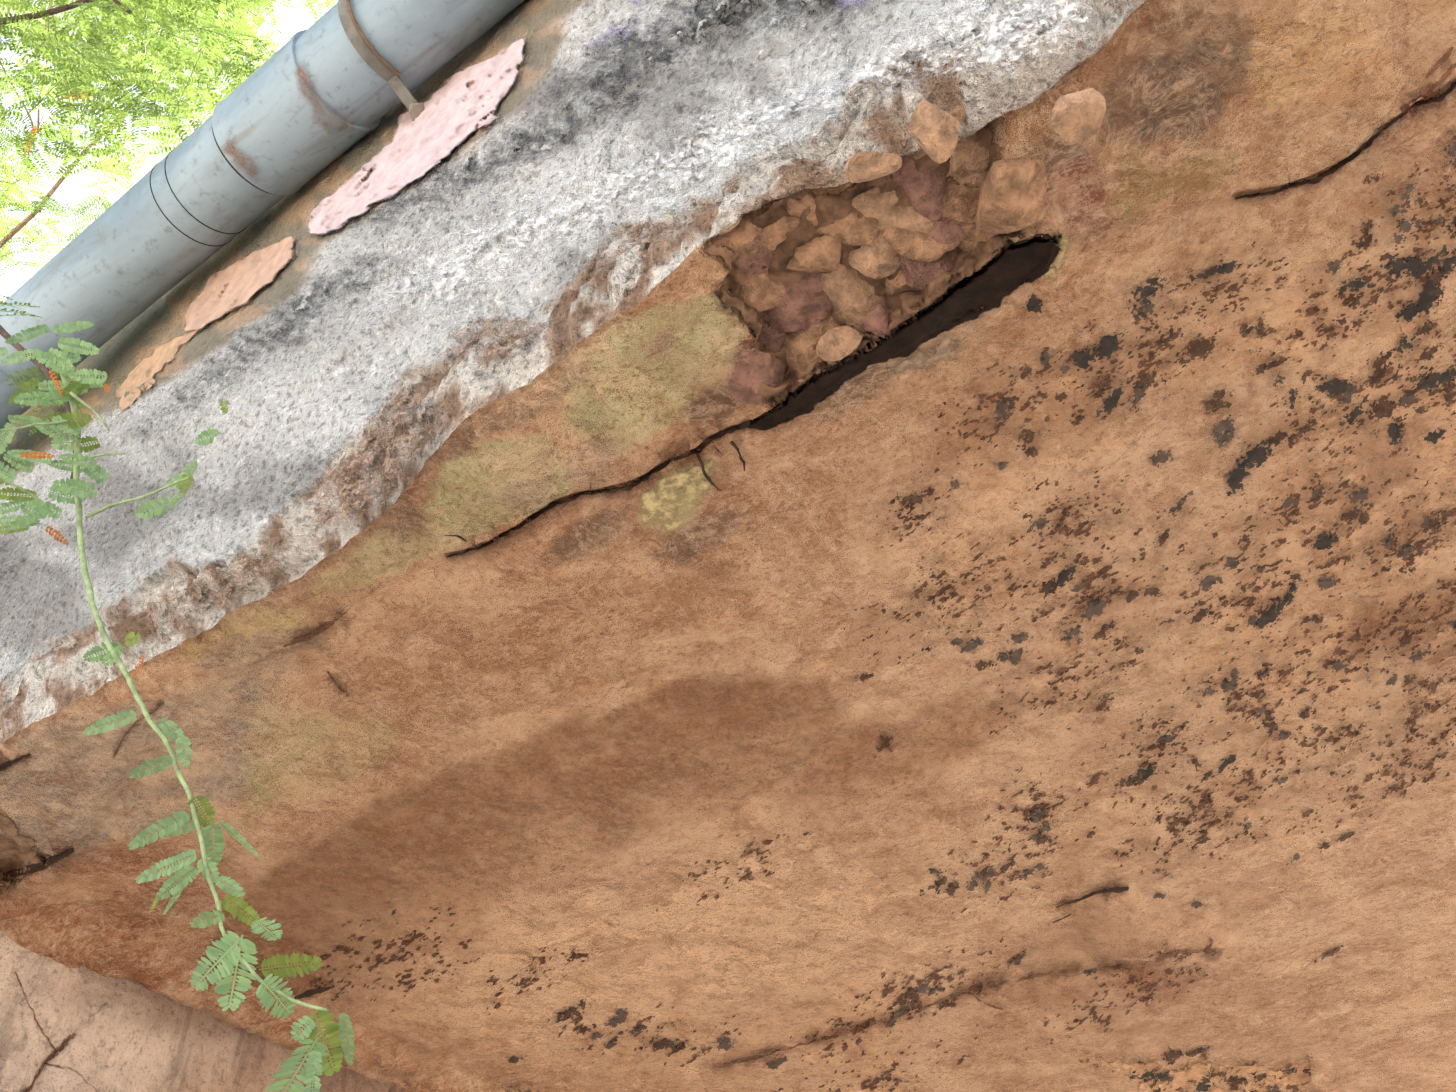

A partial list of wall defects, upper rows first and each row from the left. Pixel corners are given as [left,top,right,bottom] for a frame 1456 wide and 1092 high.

spalling [1050,88,1106,144]
crack [1235,47,1456,200]
spalling [705,100,1069,431]
crack [444,407,780,557]
leakage [854,136,1456,914]
spalling [0,742,19,761]
spalling [0,814,49,889]
leakage [215,680,824,1015]
crack [15,972,95,1092]
leakage [548,998,741,1067]
leakage [763,937,1026,1092]
leakage [1044,943,1217,1045]